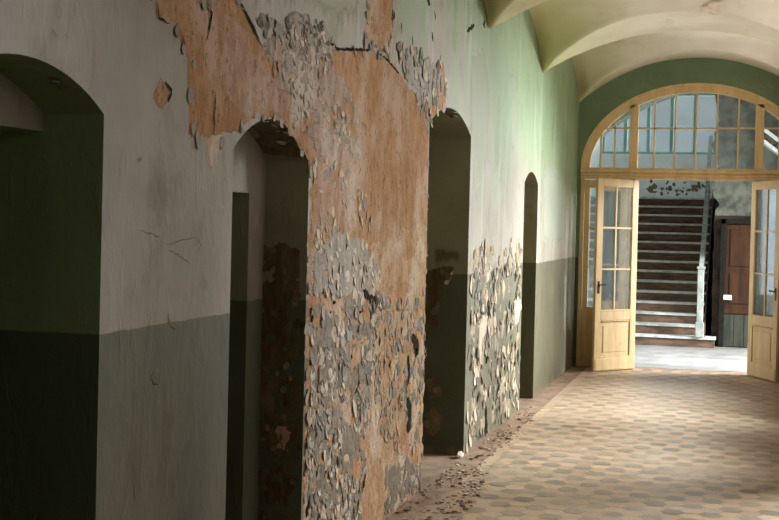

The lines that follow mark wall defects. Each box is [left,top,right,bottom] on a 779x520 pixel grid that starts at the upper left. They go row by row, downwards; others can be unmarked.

flaking render [150,0,459,520]
peeling [466,238,523,454]